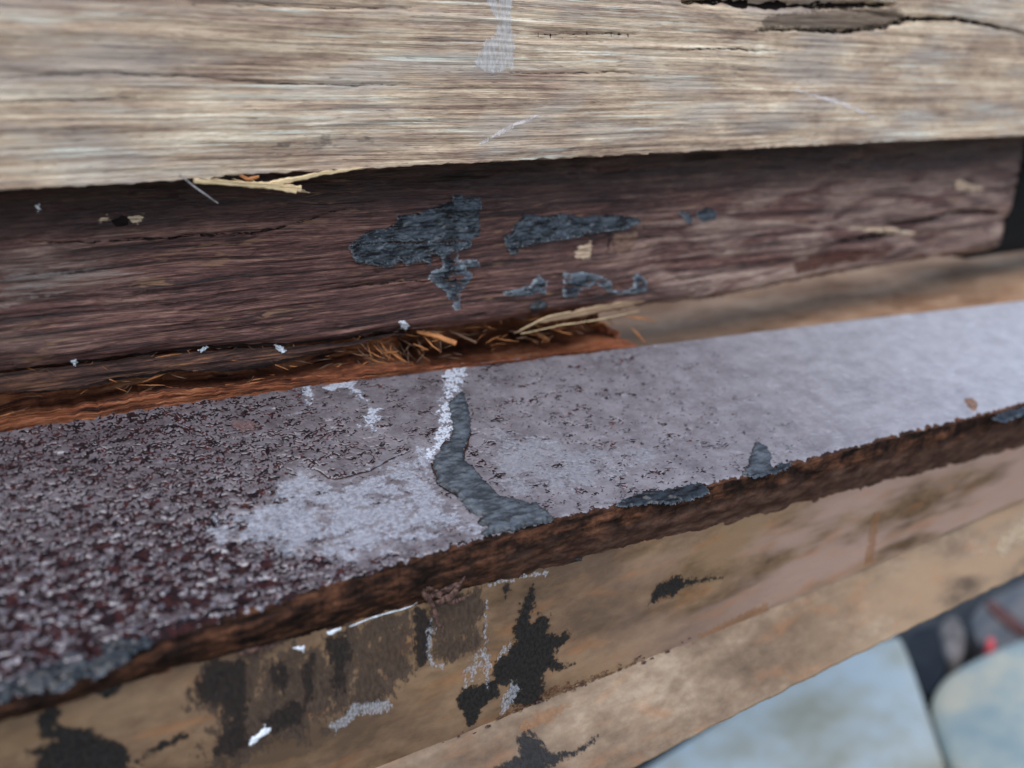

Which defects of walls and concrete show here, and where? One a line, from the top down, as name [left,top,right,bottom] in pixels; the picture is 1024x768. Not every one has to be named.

crack [682,0,1024,52]
peeling [348,194,482,310]
peeling [504,213,648,298]
peeling [503,274,548,312]
efflorescence [303,380,381,431]
efflorescence [421,367,466,458]
peeling [431,392,554,537]
peeling [742,441,792,479]
peeling [616,482,710,508]